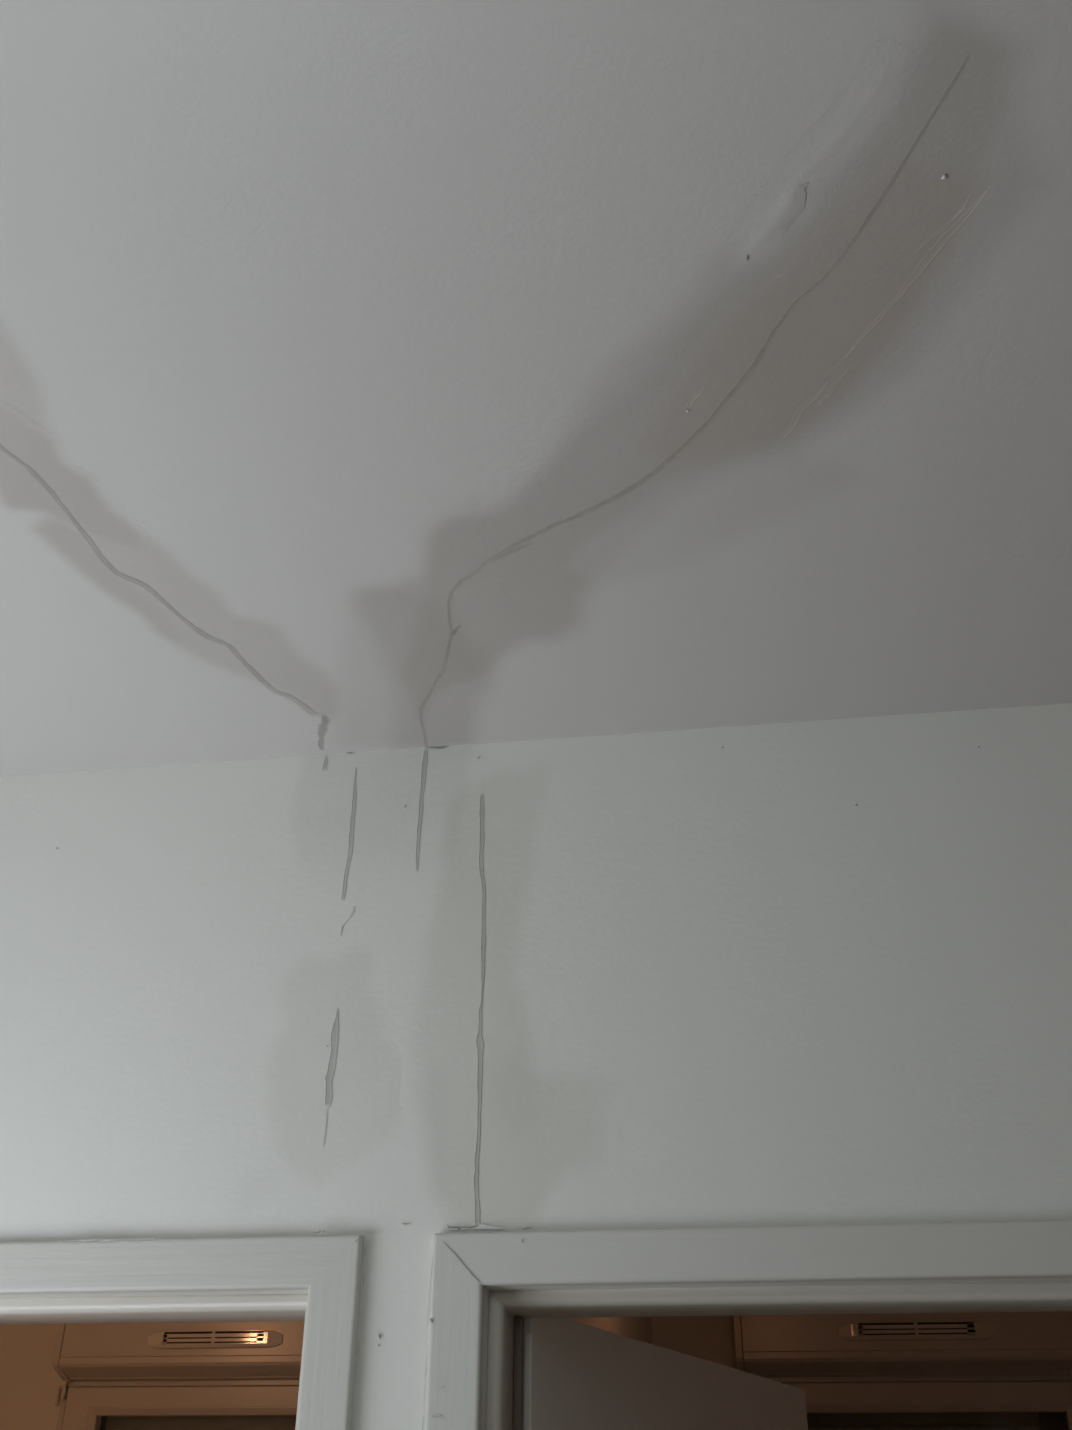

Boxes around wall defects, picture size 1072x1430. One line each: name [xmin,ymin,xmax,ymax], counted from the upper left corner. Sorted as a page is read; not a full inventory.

crack [0,444,357,936]
damp [0,0,1072,754]
crack [415,54,970,871]
crack [322,1009,339,1149]
damp [211,744,635,1238]
crack [444,794,486,1284]